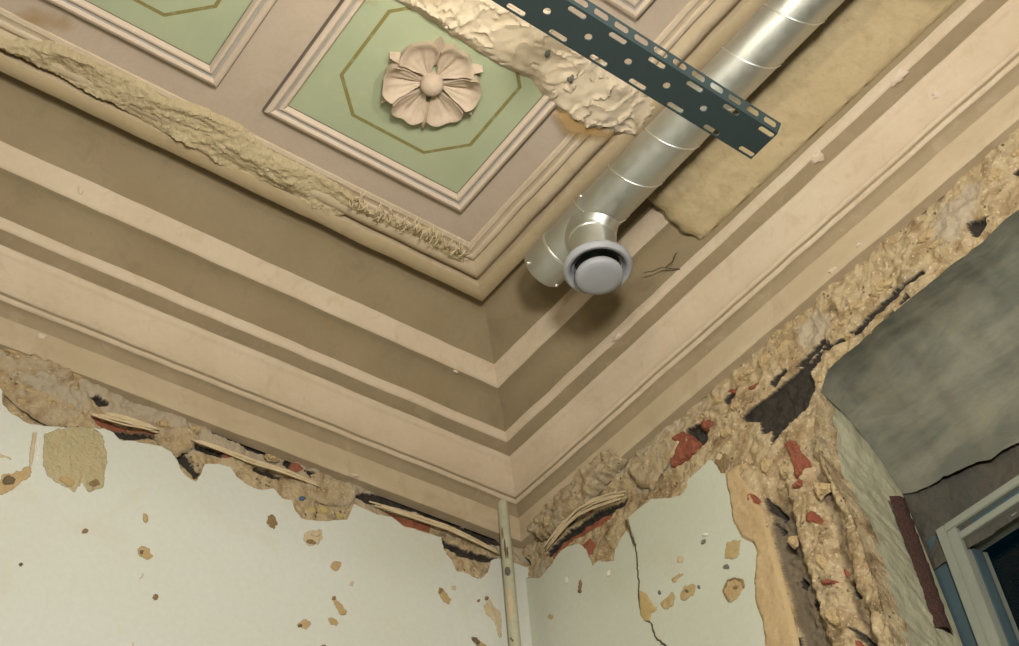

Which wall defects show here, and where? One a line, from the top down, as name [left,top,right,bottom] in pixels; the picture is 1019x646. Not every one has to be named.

flaking render [4,128,1019,646]
crack [625,519,667,646]